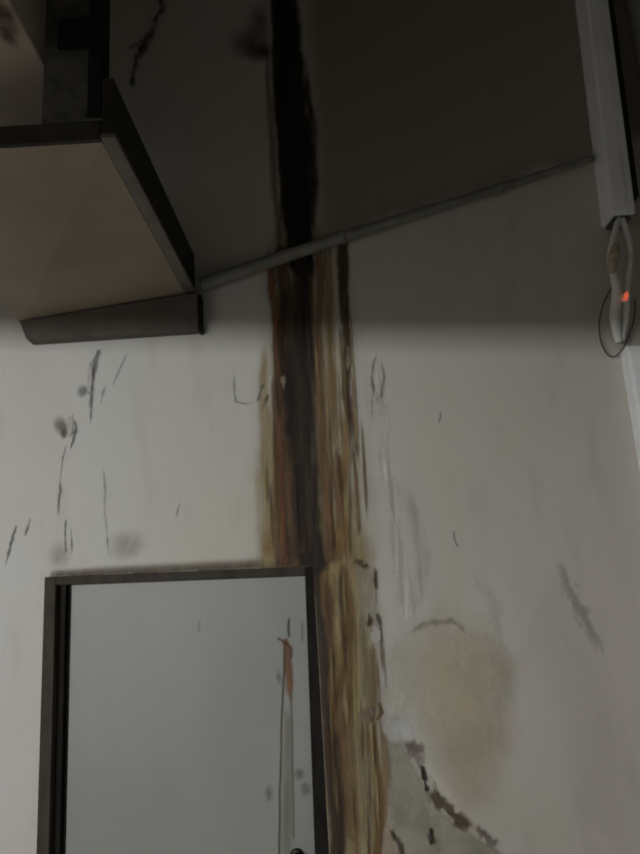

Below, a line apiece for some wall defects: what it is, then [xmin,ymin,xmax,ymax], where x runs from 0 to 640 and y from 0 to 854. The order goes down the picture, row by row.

crack [130,0,164,86]
damp [239,0,318,248]
rust [262,242,389,854]
spalling [382,659,498,854]